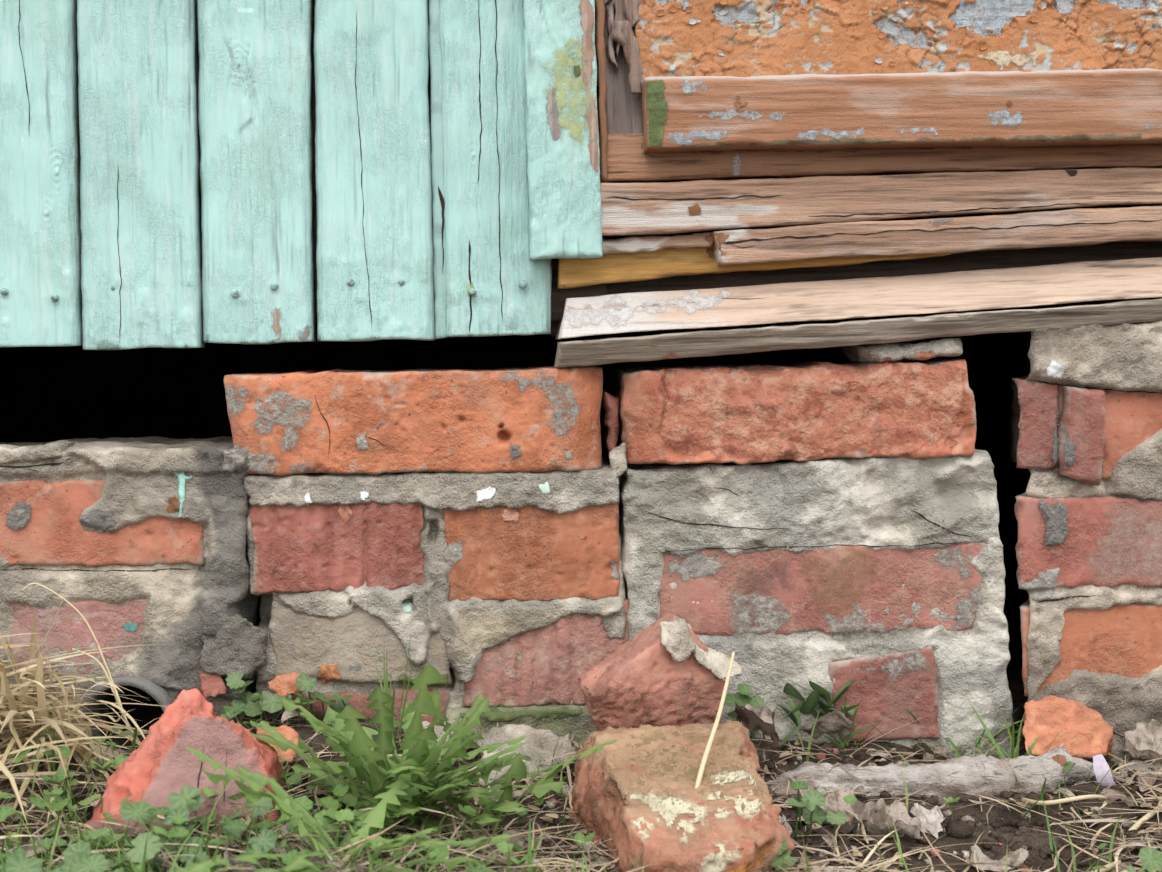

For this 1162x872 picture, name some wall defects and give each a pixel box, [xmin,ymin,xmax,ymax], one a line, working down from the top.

peeling [650,0,784,30]
peeling [872,0,933,48]
peeling [949,0,1145,70]
peeling [681,80,707,95]
peeling [669,110,785,145]
peeling [798,128,864,140]
peeling [988,110,1022,126]
crack [438,0,503,333]